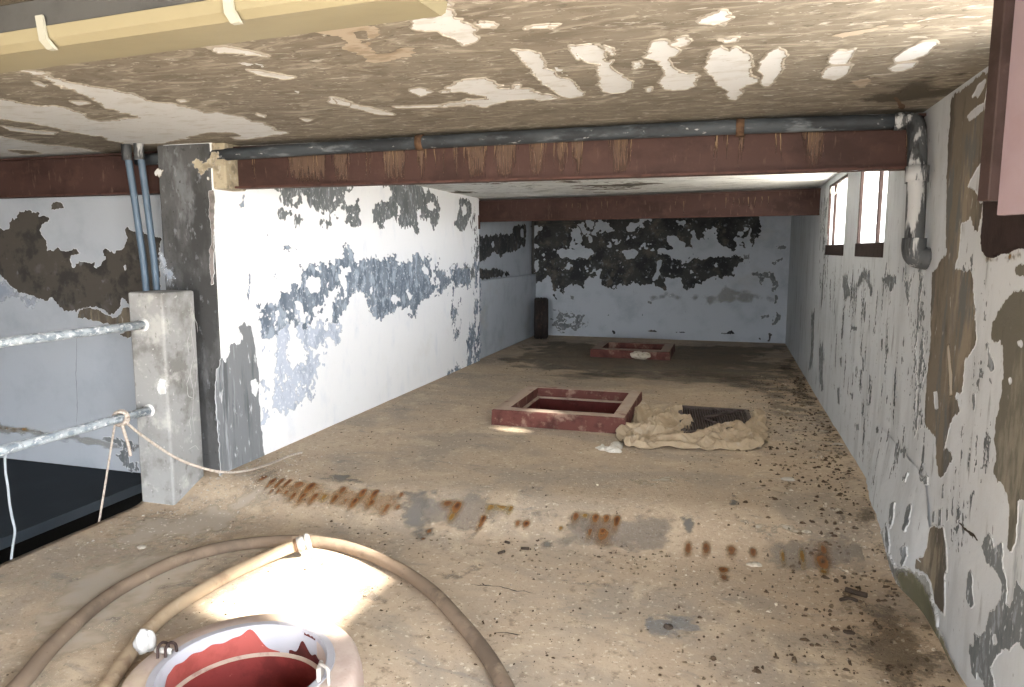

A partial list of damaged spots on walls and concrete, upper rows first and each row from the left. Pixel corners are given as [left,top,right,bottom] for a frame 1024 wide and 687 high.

peeling [473,21,500,29]
peeling [669,35,694,47]
peeling [826,25,889,65]
rust [383,141,583,179]
peeling [0,201,176,339]
peeling [215,182,787,476]
peeling [808,71,1024,687]
rust [258,475,404,514]
rust [477,505,530,529]
rust [559,512,621,545]
rust [684,542,710,556]
rust [718,546,736,581]